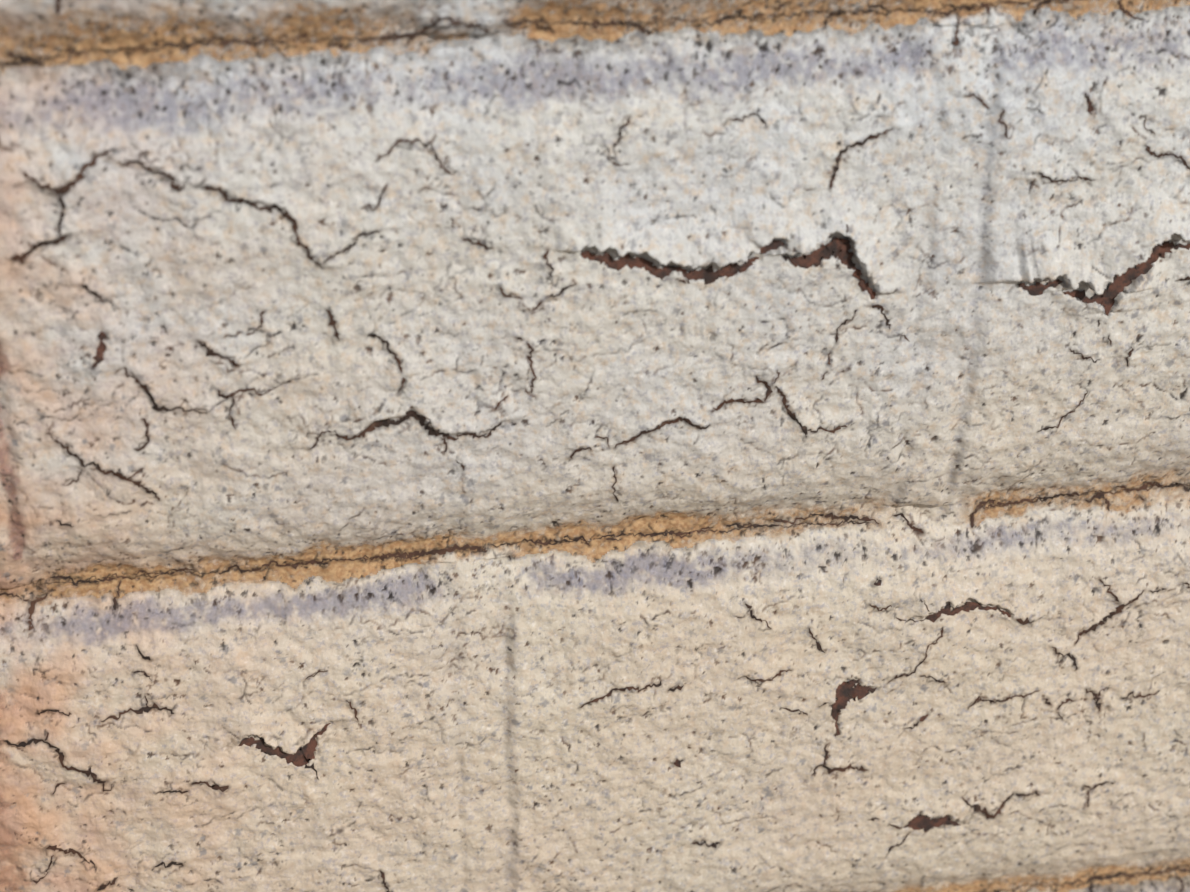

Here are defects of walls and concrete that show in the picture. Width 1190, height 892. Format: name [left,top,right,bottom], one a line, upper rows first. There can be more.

crack [10,138,452,269]
crack [47,341,290,501]
crack [311,334,537,470]
crack [570,370,847,501]
crack [0,513,924,630]
crack [5,709,112,794]
crack [101,645,174,722]
peeling [820,679,877,738]
crack [894,628,945,683]
crack [962,791,1040,819]
crack [968,580,1190,721]
crack [33,845,117,891]